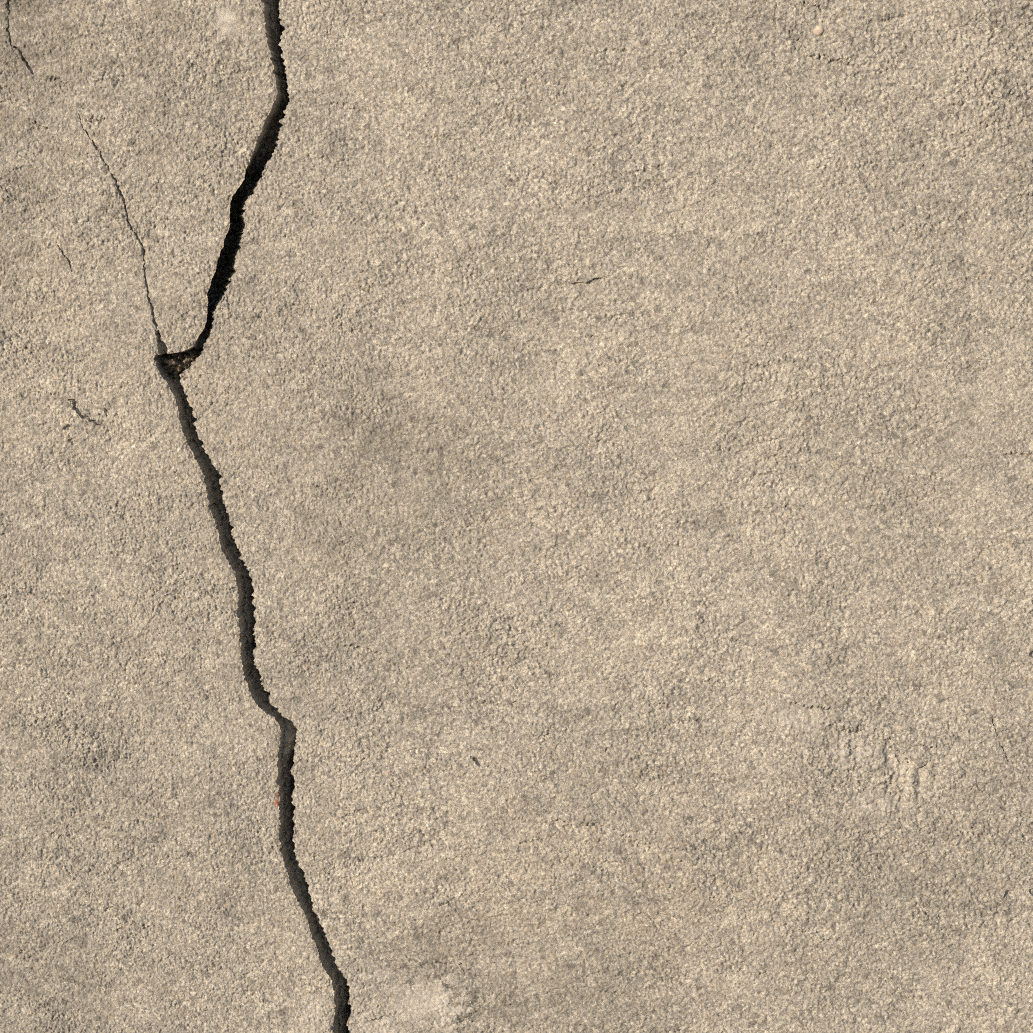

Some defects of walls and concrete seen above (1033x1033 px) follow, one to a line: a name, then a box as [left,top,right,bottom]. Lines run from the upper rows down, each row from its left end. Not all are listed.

crack [6,0,34,76]
crack [56,242,72,272]
crack [63,399,111,446]
crack [78,0,353,1033]